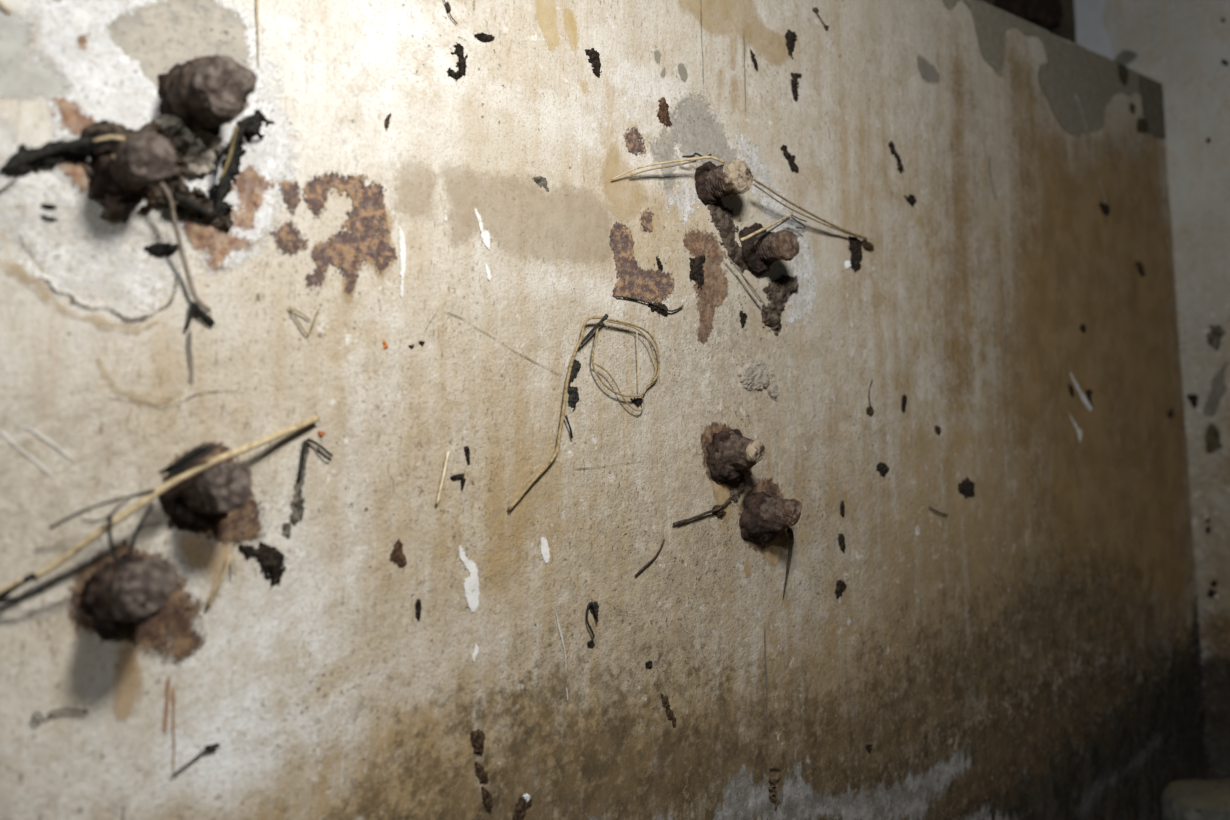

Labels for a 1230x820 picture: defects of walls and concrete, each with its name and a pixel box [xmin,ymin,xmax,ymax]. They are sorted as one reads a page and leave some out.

flaking render [105,0,253,87]
damp [537,0,578,49]
damp [680,0,788,112]
peeling [942,0,1166,139]
rust [624,126,647,157]
flaking render [0,117,194,337]
rust [180,165,398,296]
rust [609,208,675,305]
rust [683,228,729,343]
damp [358,48,1230,820]